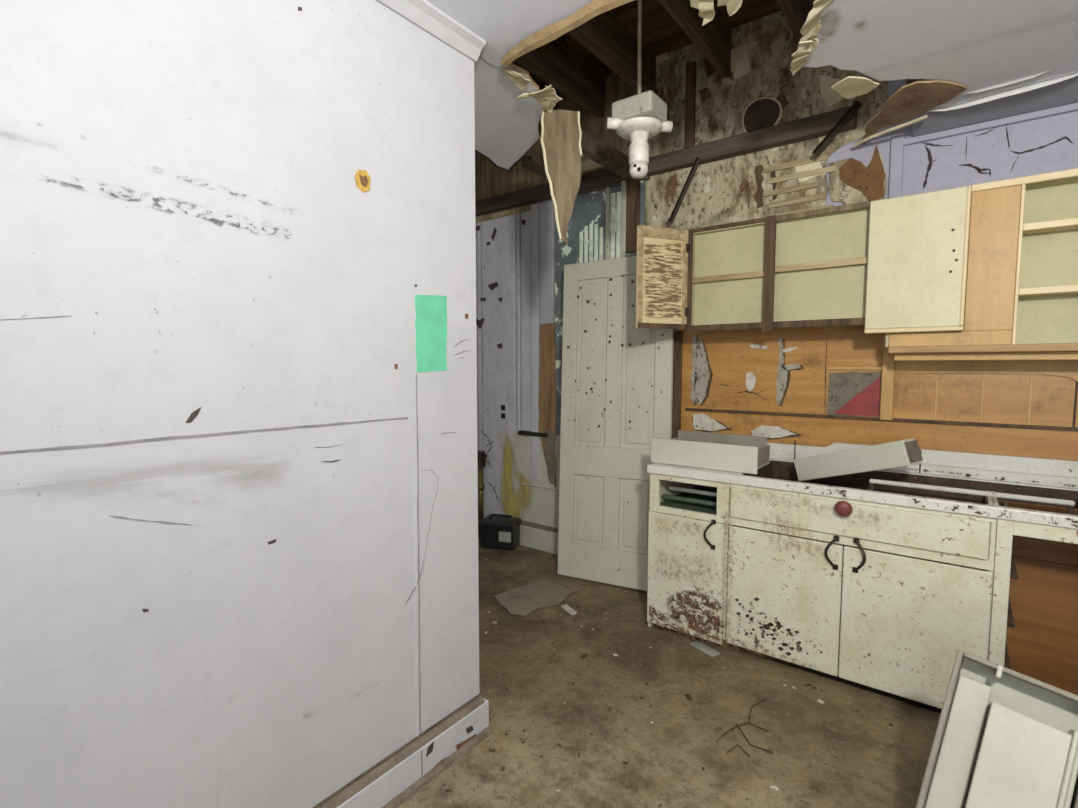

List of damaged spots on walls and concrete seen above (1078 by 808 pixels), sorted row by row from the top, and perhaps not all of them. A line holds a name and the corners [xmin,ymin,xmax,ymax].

peeling [501,68,562,112]
flaking render [626,0,890,254]
crack [921,126,1073,188]
peeling [691,335,732,432]
peeling [746,372,756,391]
peeling [749,338,804,406]